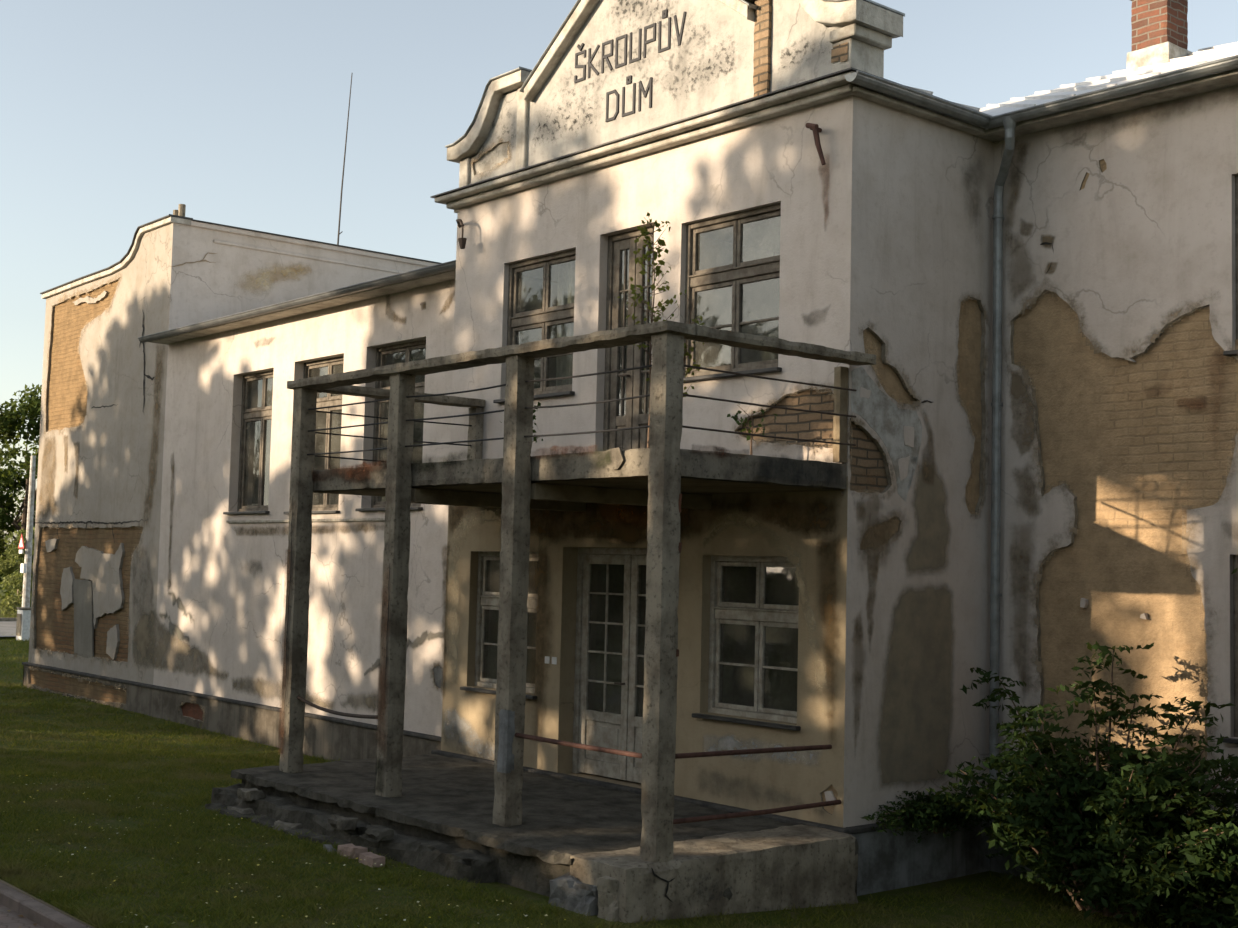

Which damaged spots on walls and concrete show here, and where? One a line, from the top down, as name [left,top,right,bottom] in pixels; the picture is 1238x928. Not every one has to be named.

peeling [1015,224,1054,251]
flaking render [44,279,120,434]
crack [92,309,154,408]
peeling [738,325,922,550]
flaking render [956,296,988,517]
flaking render [29,524,143,670]
leakage [133,596,282,696]
flaking render [1013,282,1238,780]